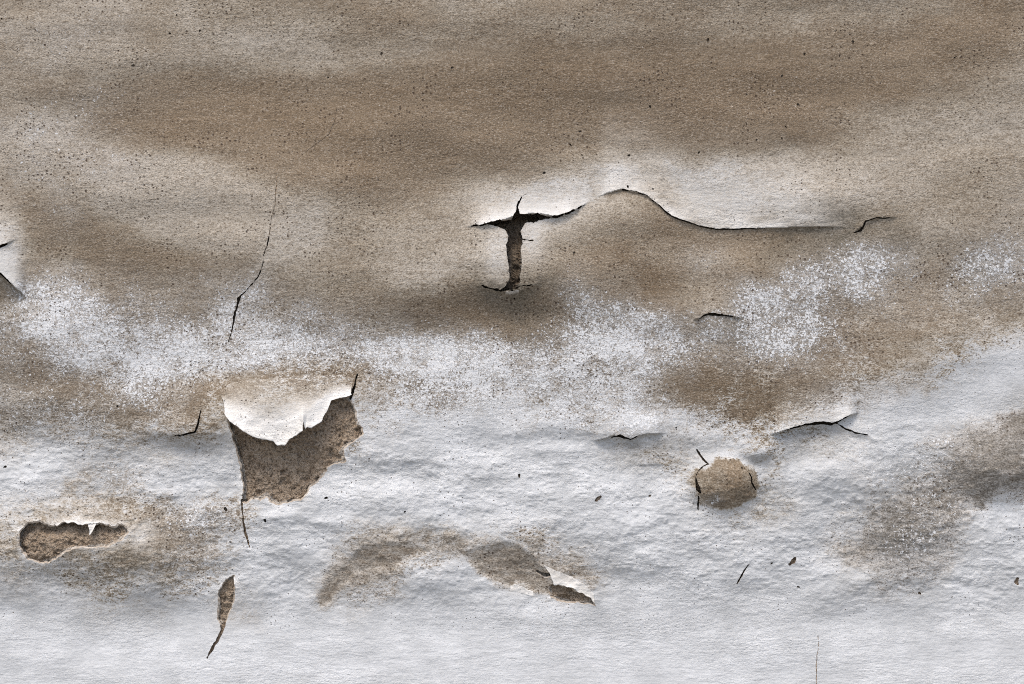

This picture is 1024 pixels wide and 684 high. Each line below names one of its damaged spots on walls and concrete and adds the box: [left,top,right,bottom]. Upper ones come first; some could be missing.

crack [228,174,277,343]
damp [0,0,1024,448]
crack [854,217,890,233]
peeling [0,243,899,548]
crack [787,415,868,436]
spalling [18,517,129,564]
spalling [217,575,242,628]
peeling [316,526,596,609]
damp [834,421,1024,587]